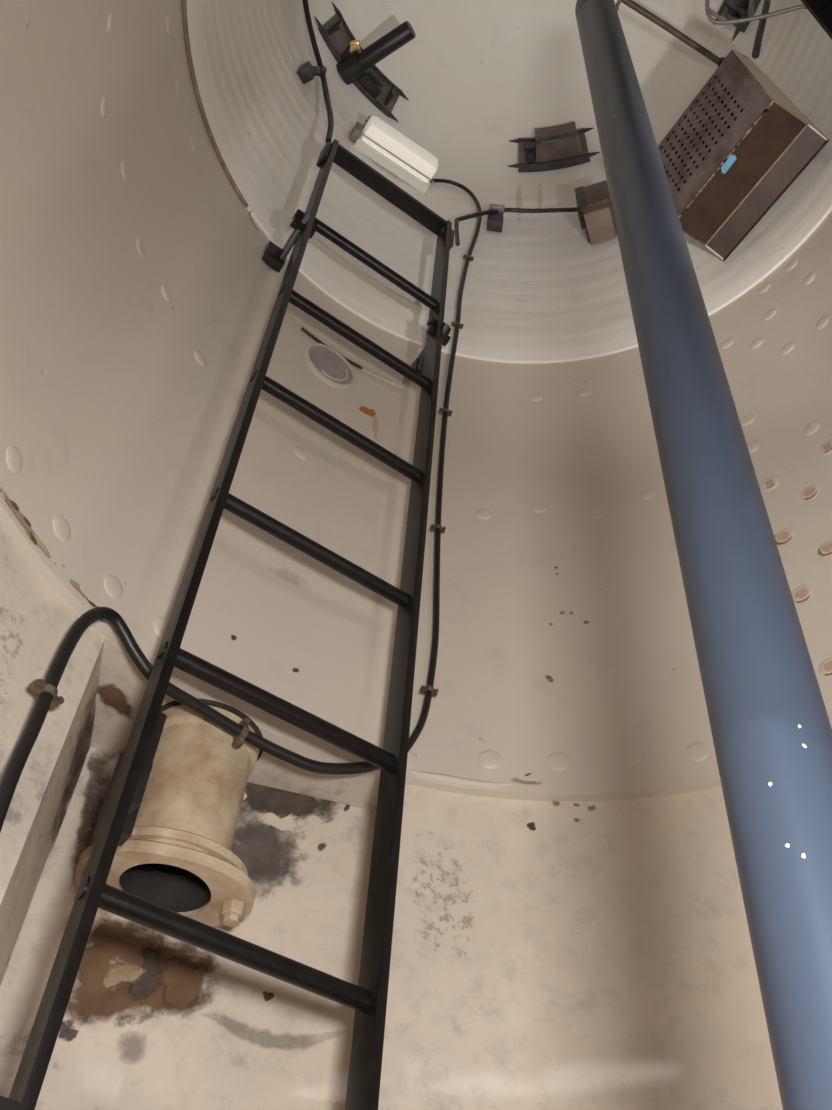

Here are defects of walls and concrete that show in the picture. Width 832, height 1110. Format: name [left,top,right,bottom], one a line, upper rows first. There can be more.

rust [359,406,378,430]
damp [50,684,132,865]
damp [231,782,350,884]